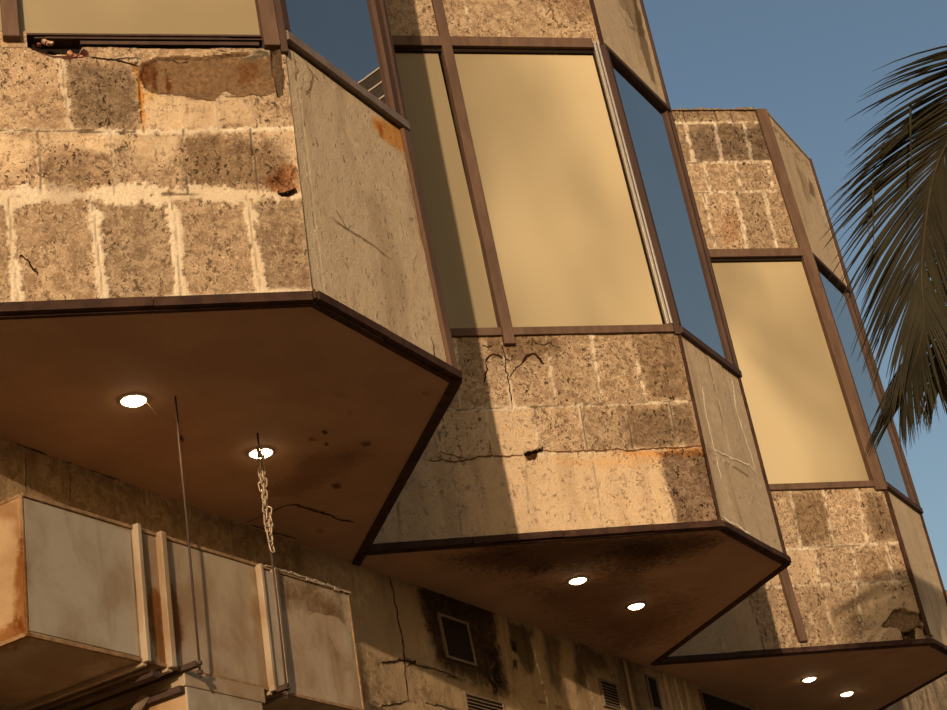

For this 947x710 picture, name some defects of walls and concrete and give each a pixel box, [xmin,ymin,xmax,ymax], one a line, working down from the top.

spalling [34,39,89,60]
peeling [138,48,285,101]
crack [483,342,550,405]
crack [428,383,758,476]
crack [246,504,355,539]
crack [721,515,750,534]
crack [380,576,457,710]
spalling [881,608,933,640]